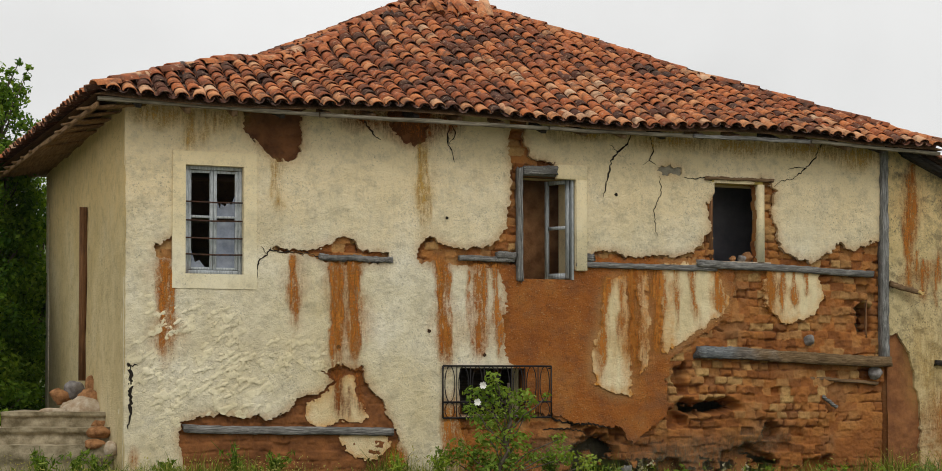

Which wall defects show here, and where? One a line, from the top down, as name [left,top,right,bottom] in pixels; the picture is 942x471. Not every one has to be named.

spalling [243,108,305,162]
spalling [387,111,430,147]
crack [603,135,662,235]
crack [774,144,822,187]
spalling [272,237,388,265]
spalling [417,120,920,471]
crack [127,363,137,429]
spalling [123,289,399,471]